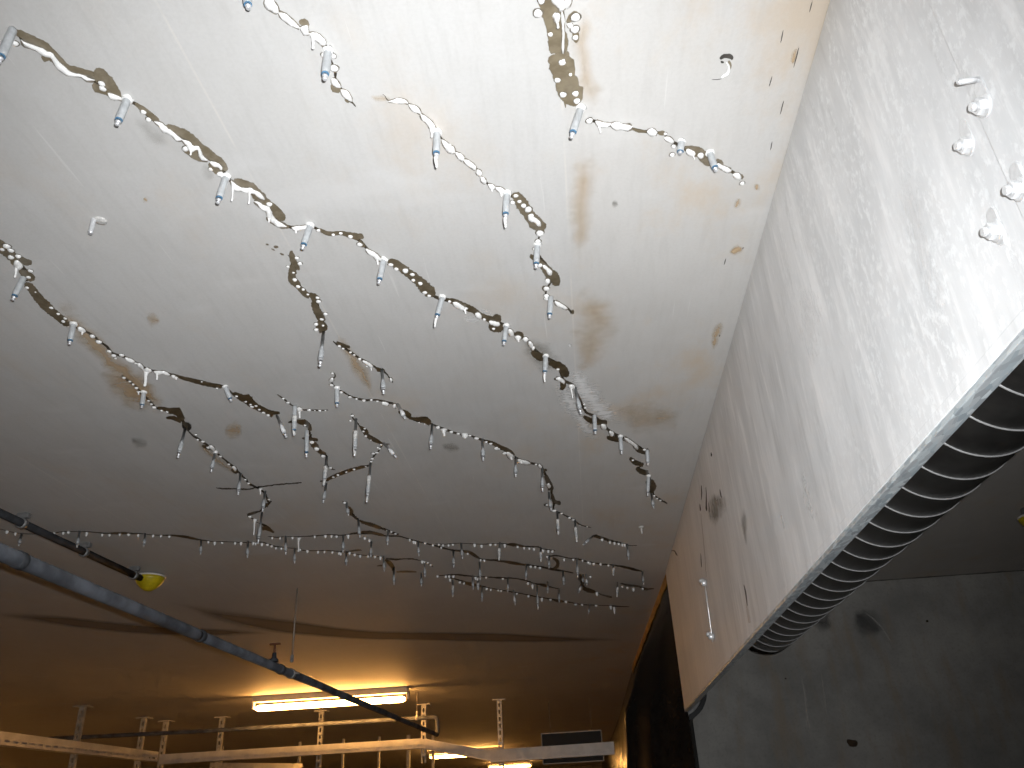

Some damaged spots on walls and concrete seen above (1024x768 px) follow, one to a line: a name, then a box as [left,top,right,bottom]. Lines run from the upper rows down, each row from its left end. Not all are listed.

crack [263,0,356,107]
crack [533,0,745,186]
crack [0,30,667,614]
leakage [558,372,615,433]